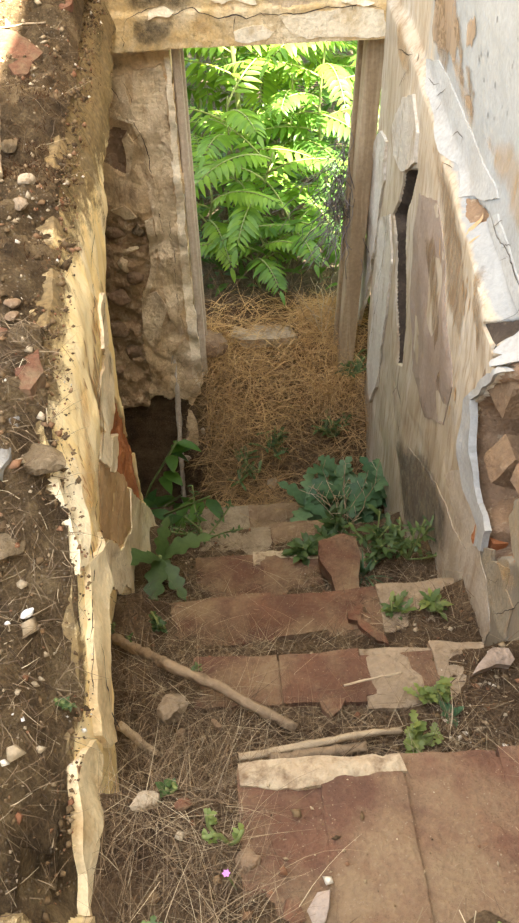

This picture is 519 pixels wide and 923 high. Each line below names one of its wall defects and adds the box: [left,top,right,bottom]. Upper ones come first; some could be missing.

leakage [134,20,172,44]
leakage [131,0,186,8]
flaking render [148,6,174,20]
crack [122,4,379,46]
flaking render [234,25,274,43]
flaking render [212,0,386,39]
spalling [357,0,519,644]
spalling [15,56,203,923]